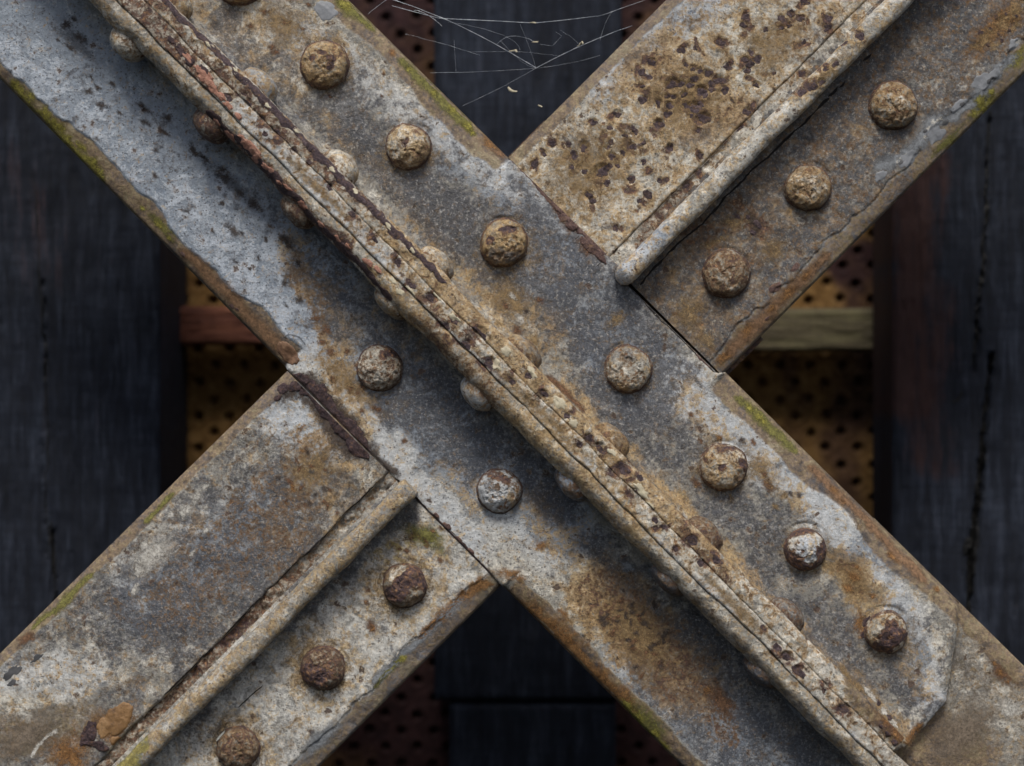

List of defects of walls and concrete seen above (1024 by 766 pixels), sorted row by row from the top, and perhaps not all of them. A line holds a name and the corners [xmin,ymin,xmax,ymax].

rust [622,0,666,44]
rust [138,102,171,136]
rust [161,0,446,283]
rust [553,204,607,264]
rust [180,249,400,477]
rust [700,225,940,592]
rust [276,450,339,514]
rust [855,612,870,639]
rust [47,729,109,766]
rust [320,652,450,766]
rust [521,589,681,766]
rust [840,666,923,746]